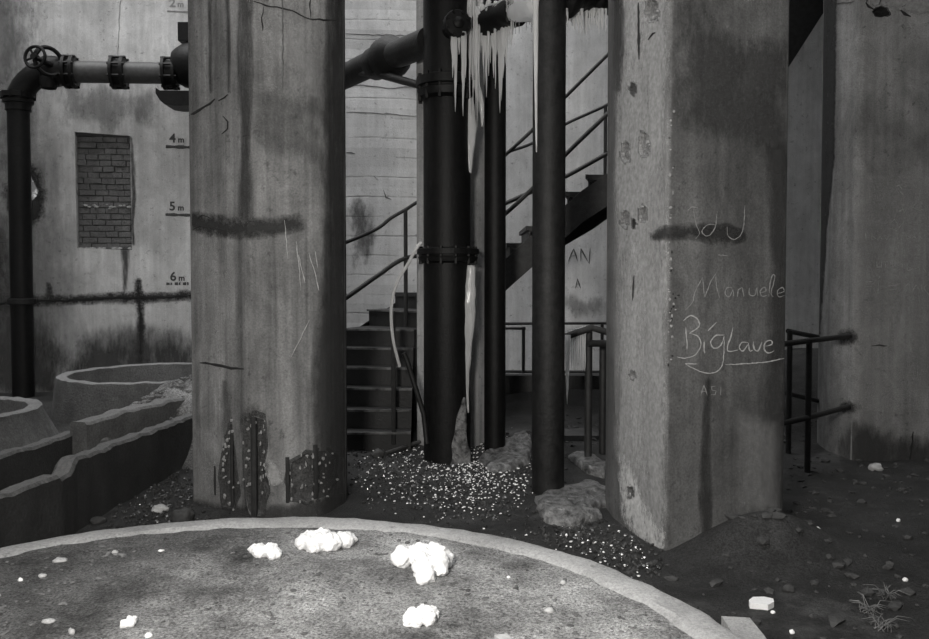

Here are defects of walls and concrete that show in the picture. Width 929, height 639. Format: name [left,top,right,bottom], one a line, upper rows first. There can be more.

crack [254,0,409,93]
spalling [644,0,660,40]
spalling [620,130,650,164]
leakage [202,0,373,518]
spalling [214,410,334,518]